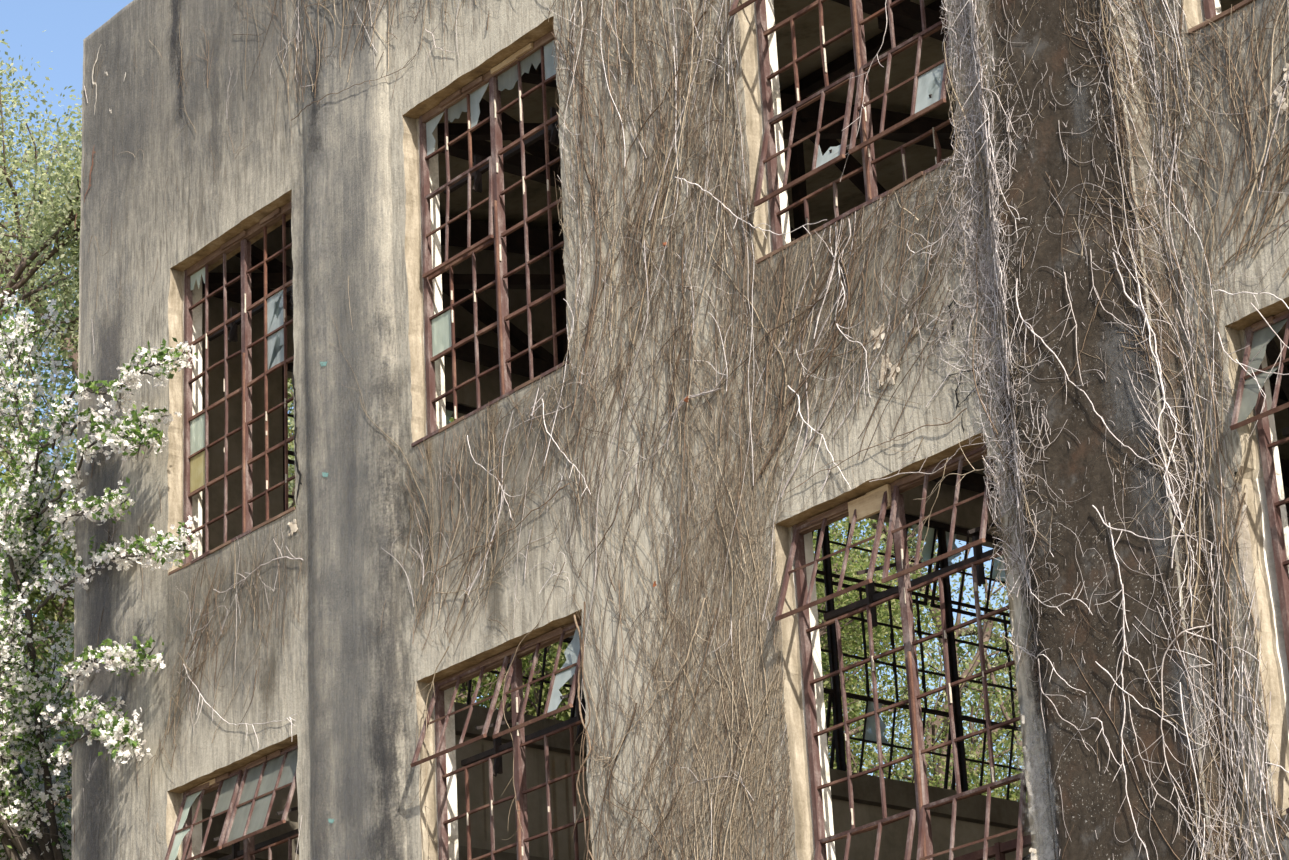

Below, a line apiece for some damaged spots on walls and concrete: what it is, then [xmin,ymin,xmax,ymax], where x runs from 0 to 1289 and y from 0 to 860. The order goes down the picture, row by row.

damp [169,0,182,114]
damp [371,380,409,860]
damp [985,0,1243,860]